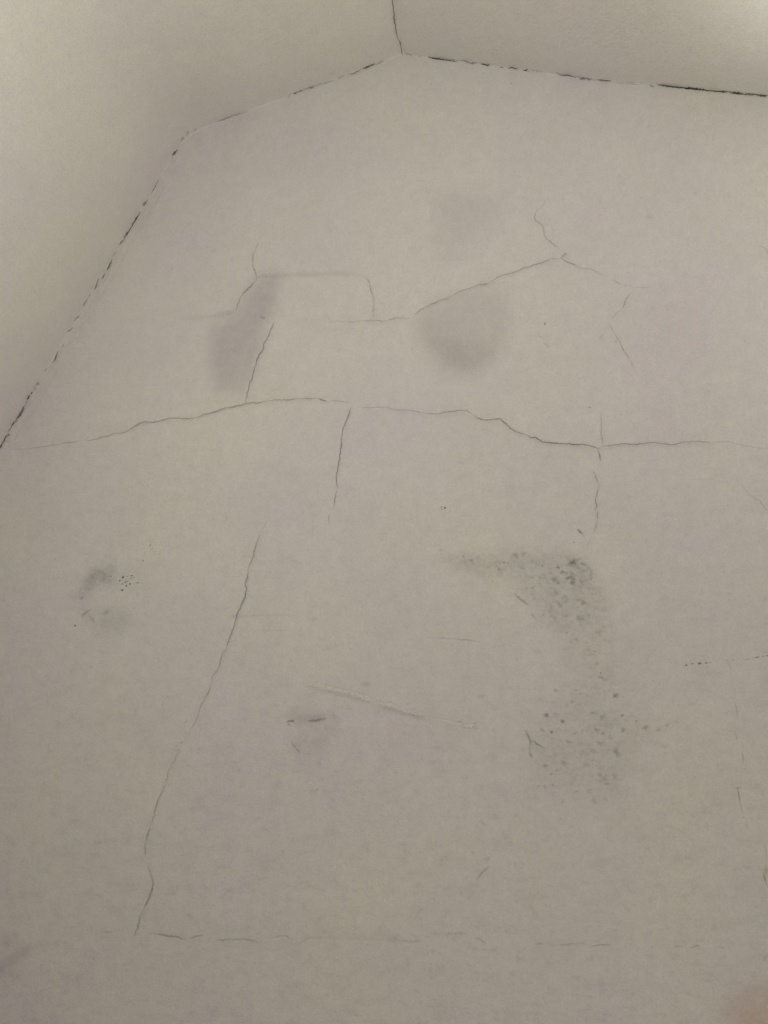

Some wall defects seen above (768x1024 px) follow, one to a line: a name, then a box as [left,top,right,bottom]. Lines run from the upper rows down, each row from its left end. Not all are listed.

crack [0,392,32,448]